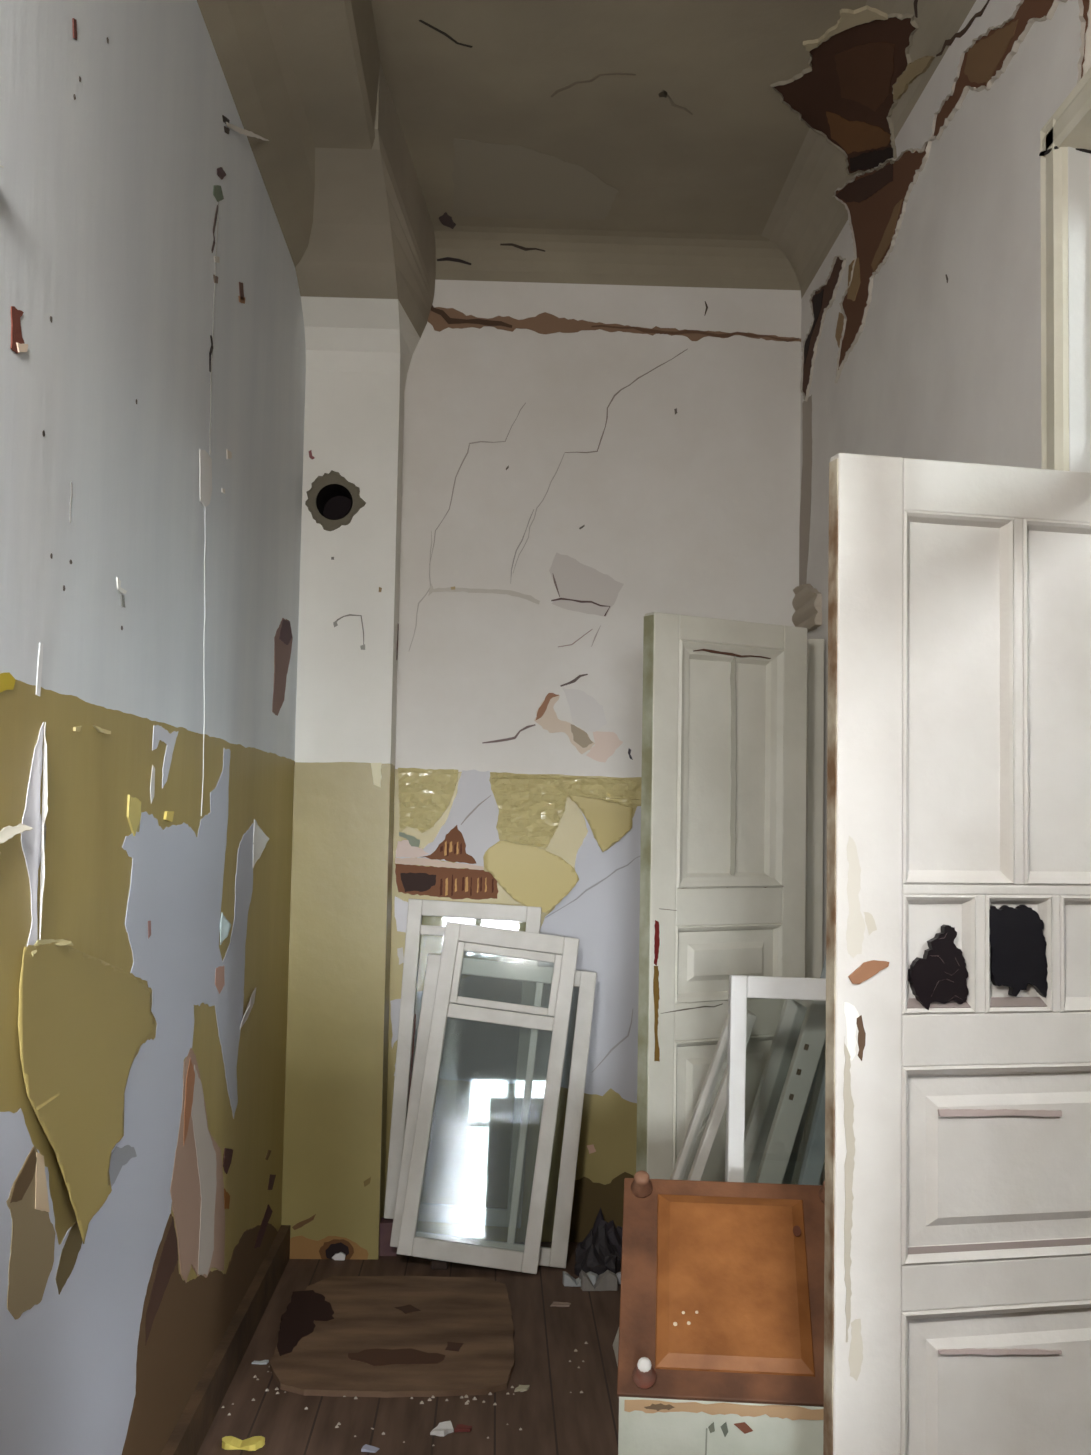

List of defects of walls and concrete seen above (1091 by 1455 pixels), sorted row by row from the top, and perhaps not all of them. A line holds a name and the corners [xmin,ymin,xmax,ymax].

crack [936,0,990,57]
crack [437,257,471,265]
crack [500,243,545,252]
spalling [770,0,1091,401]
flaking render [272,618,293,716]
crack [336,403,526,659]
crack [551,573,610,687]
peeling [549,553,624,617]
crack [427,301,801,584]
peeling [394,770,500,965]
peeling [439,806,641,1103]
peeling [0,722,278,1455]